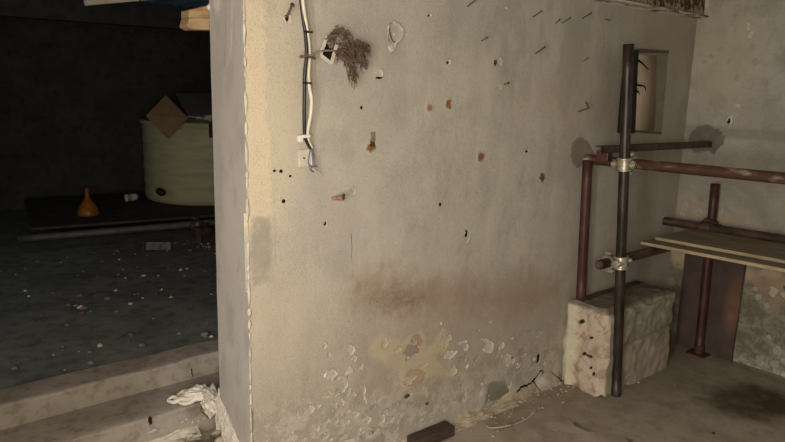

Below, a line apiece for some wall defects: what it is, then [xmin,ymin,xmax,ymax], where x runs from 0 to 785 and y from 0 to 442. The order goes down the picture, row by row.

peeling [675,196,755,230]
spalling [244,88,254,442]
water stain [327,244,572,338]
peeling [742,265,785,319]
peeling [288,321,553,442]
crack [516,370,561,392]
peeling [158,407,216,439]